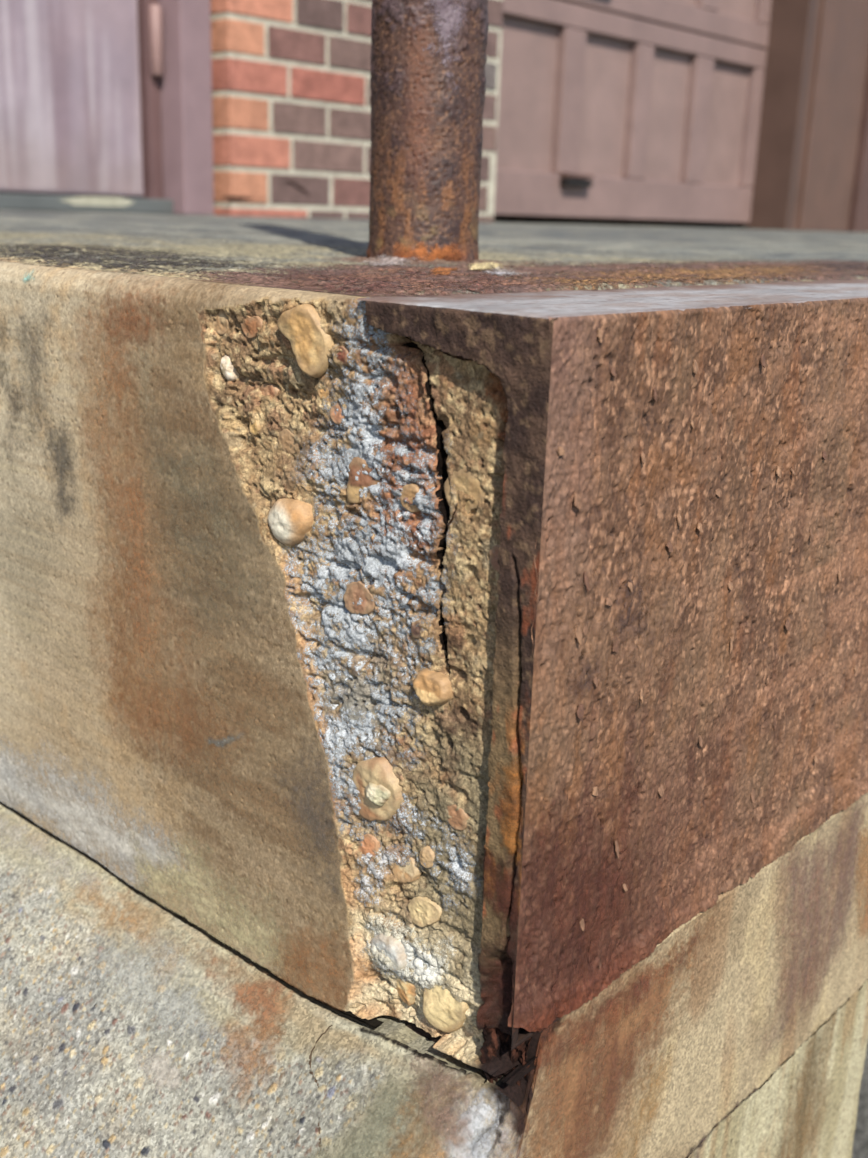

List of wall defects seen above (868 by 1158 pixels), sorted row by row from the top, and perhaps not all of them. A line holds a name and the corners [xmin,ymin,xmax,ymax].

corrosion [180,242,868,297]
spalling [197,299,538,1081]
crack [400,337,488,675]
corrosion [566,561,667,692]
crack [0,802,469,1088]
corrosion [477,763,523,1025]
crack [743,979,868,1100]
corrosion [779,810,863,1021]